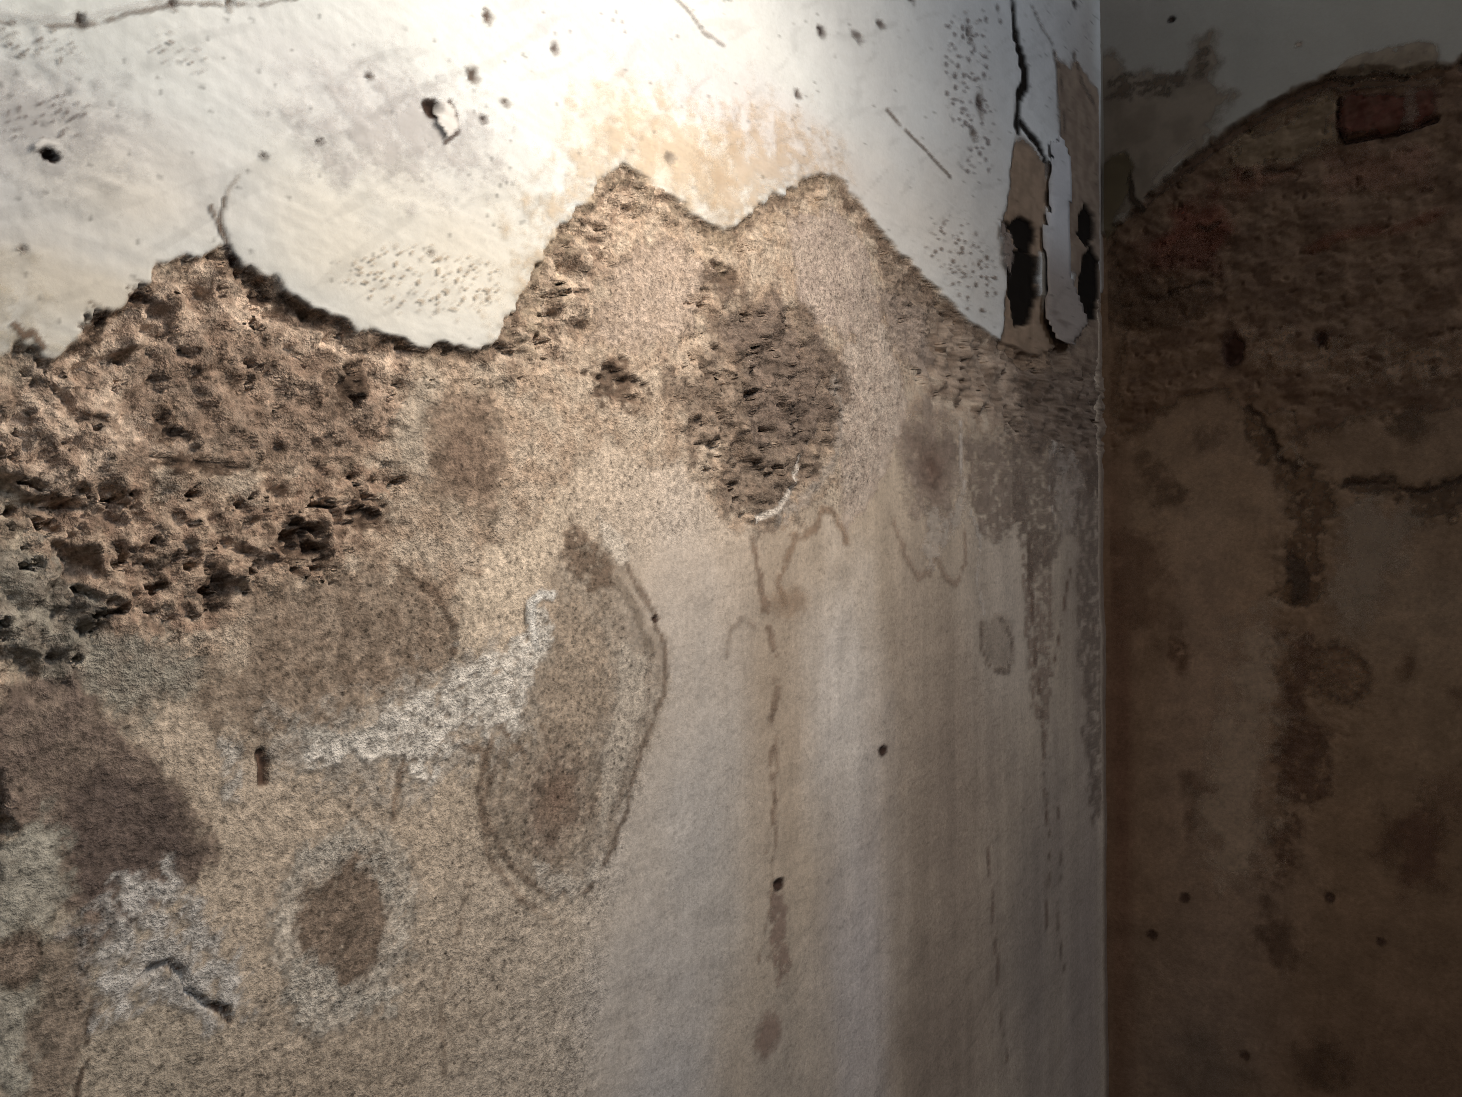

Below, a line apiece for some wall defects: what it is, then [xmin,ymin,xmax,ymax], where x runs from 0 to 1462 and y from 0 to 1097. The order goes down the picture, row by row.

spalling [76,12,85,27]
crack [48,2,265,27]
crack [997,0,1051,203]
peeling [1331,41,1439,84]
spalling [0,52,1146,734]
water stain [754,455,848,560]
spalling [1244,405,1462,607]
flaking render [0,802,76,943]
water stain [0,671,257,1097]
water stain [198,512,666,1038]
water stain [1184,608,1372,887]
flaking render [0,968,47,1097]